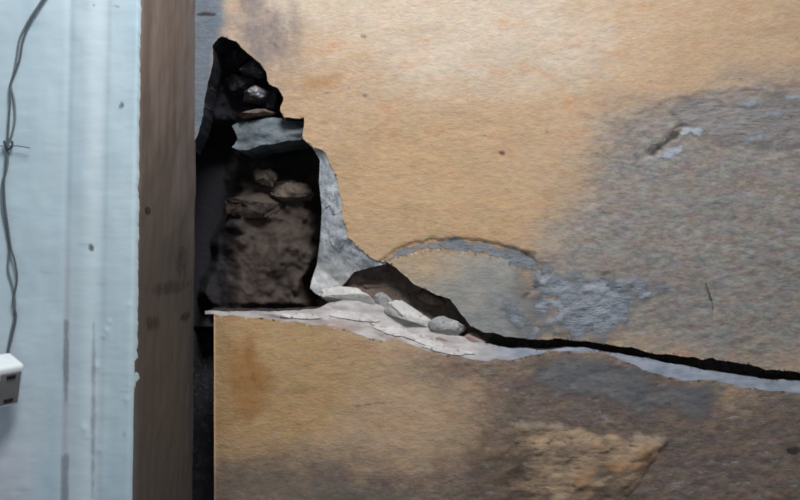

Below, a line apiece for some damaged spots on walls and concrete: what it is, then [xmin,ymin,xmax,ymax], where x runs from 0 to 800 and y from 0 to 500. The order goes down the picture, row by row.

spalling [194,47,800,393]
crack [343,262,800,379]